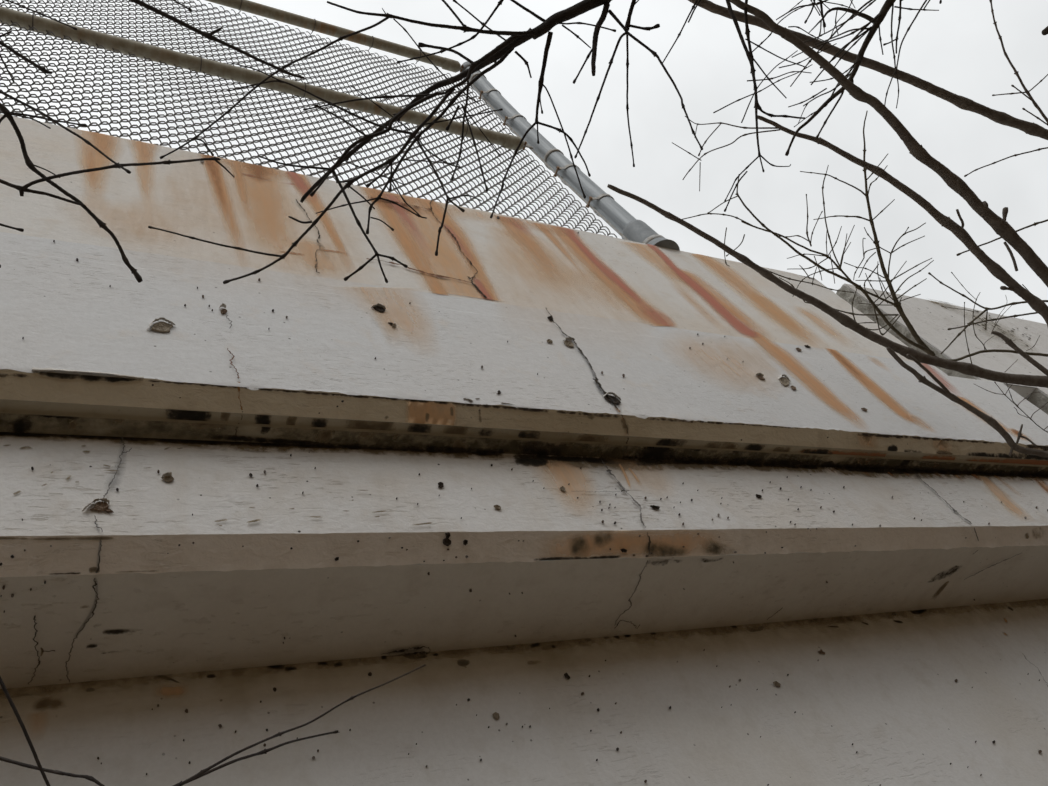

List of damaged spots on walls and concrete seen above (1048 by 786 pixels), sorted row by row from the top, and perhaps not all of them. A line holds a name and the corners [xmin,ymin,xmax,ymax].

rust [84,131,113,185]
rust [203,154,283,241]
rust [288,171,344,266]
crack [366,197,486,298]
rust [365,187,498,301]
rust [499,216,673,326]
rust [631,243,855,418]
rust [827,348,913,421]
damp [0,402,1048,492]
crack [546,308,651,629]
crack [28,436,131,684]